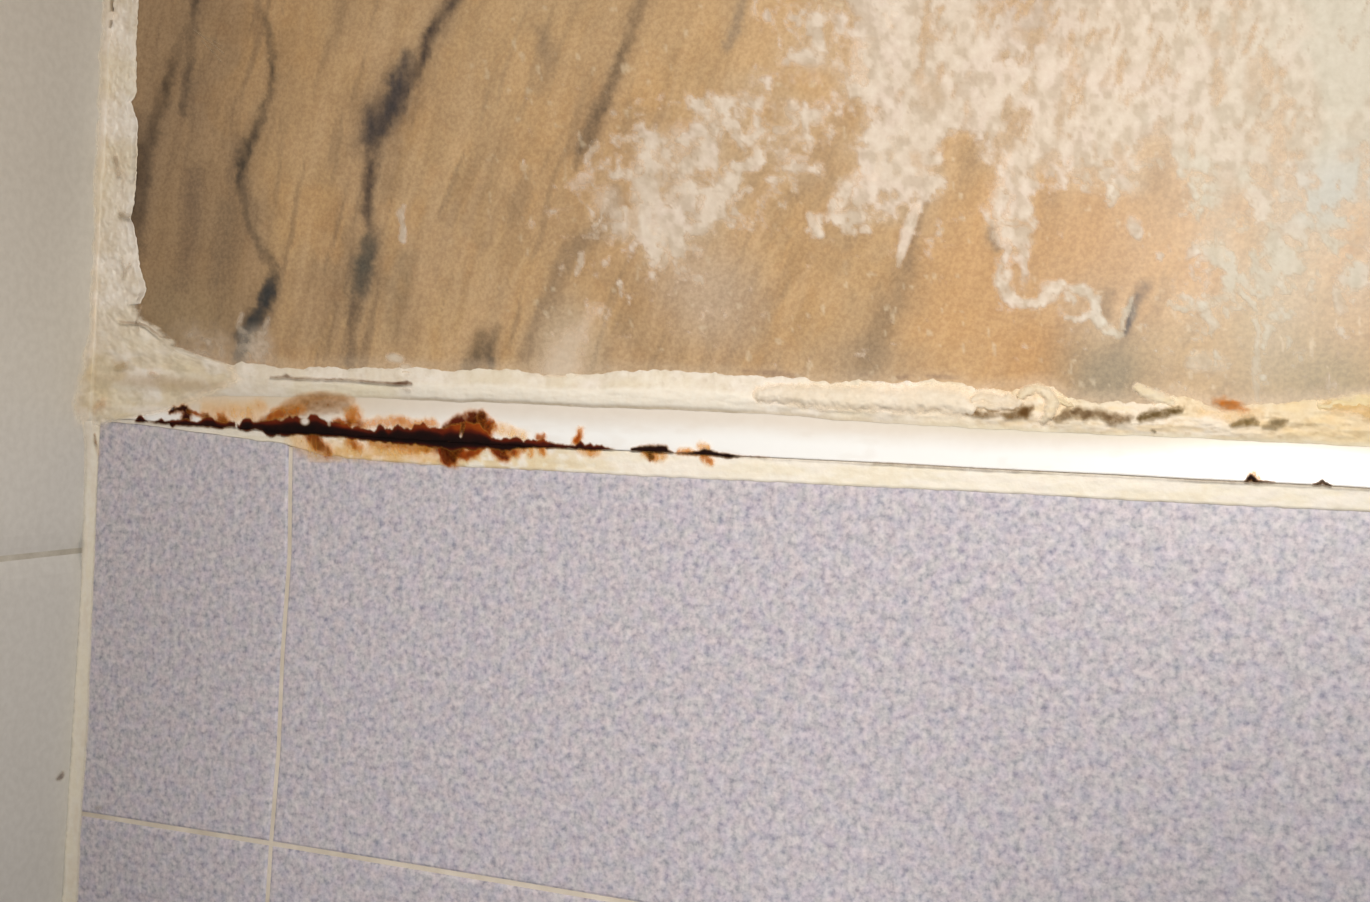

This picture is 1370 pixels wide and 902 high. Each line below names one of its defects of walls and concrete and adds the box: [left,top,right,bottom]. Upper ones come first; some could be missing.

corrosion [135,399,612,467]
corrosion [631,445,764,465]